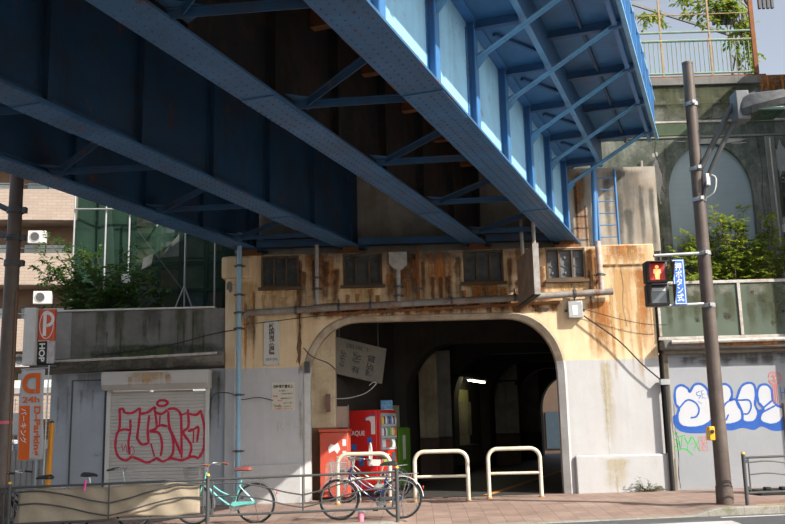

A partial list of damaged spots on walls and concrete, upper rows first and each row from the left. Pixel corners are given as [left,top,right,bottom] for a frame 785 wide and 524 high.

corrosion [761,75,785,92]
corrosion [243,174,652,356]